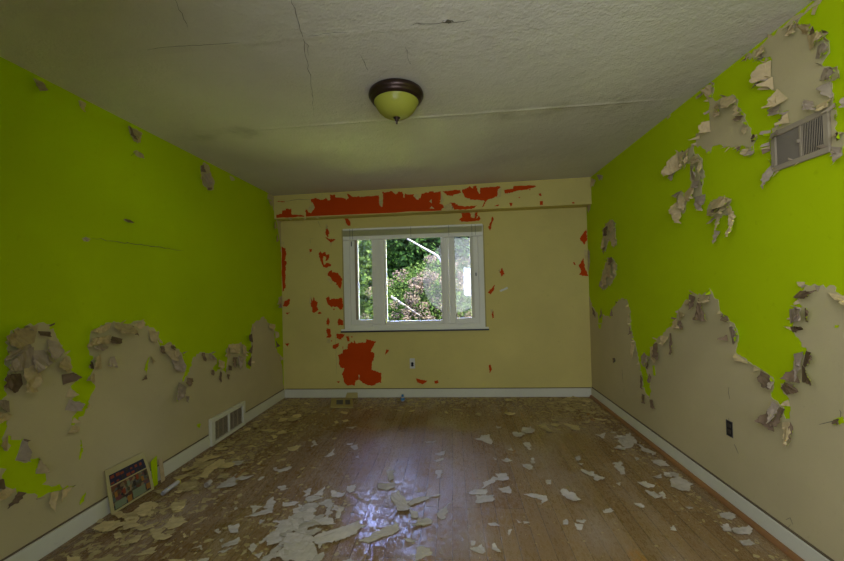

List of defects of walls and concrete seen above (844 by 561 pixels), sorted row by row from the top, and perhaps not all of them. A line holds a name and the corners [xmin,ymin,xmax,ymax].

peeling [200,162,215,191]
peeling [267,185,543,386]
peeling [661,0,844,243]
peeling [0,317,289,561]
peeling [576,455,605,481]
peeling [589,282,844,561]